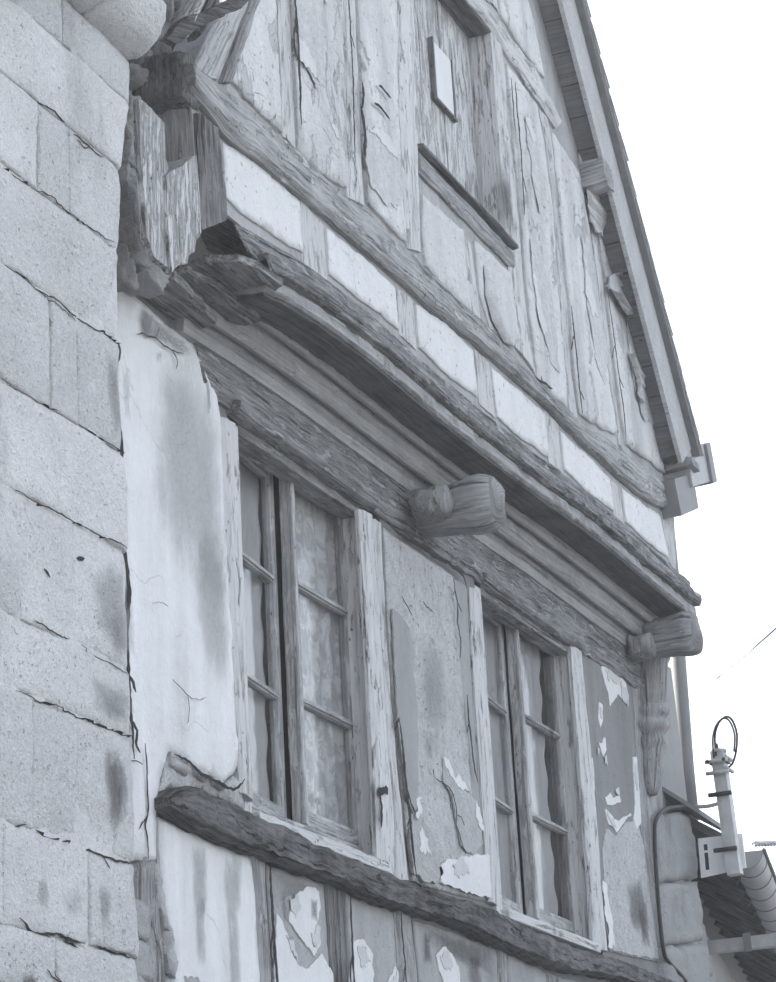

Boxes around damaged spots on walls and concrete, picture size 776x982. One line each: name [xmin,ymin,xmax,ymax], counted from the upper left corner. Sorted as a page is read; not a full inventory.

crack [293,0,302,125]
crack [348,0,391,156]
crack [8,267,185,369]
crack [9,385,56,410]
crack [79,424,125,457]
crack [13,489,149,868]
peeling [391,609,492,898]
peeling [592,666,659,959]
peeling [273,886,334,982]
peeling [348,939,374,982]
peeling [388,963,399,982]
peeling [435,946,460,982]